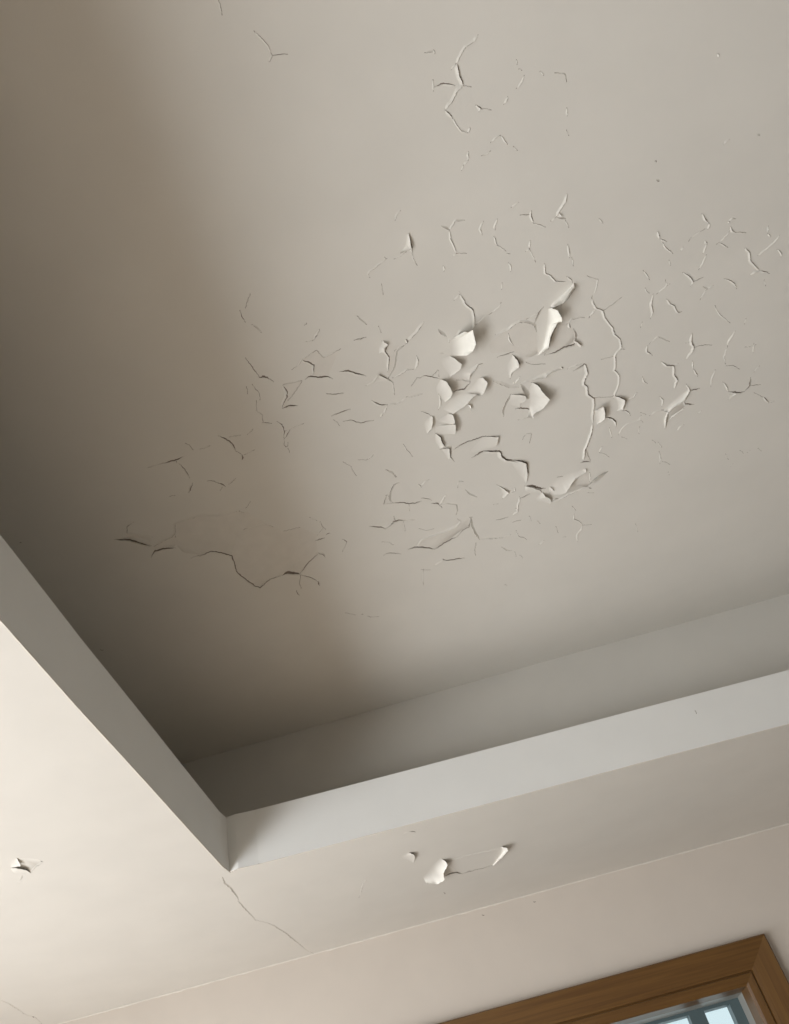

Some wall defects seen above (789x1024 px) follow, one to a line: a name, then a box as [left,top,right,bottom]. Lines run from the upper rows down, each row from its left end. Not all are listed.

crack [424,35,567,133]
crack [442,210,545,272]
crack [454,292,475,329]
crack [543,214,782,403]
crack [148,359,304,497]
crack [326,370,383,426]
peeling [366,284,637,504]
peeling [651,384,700,429]
crack [384,444,592,585]
peeling [423,858,462,884]
crack [220,878,312,953]